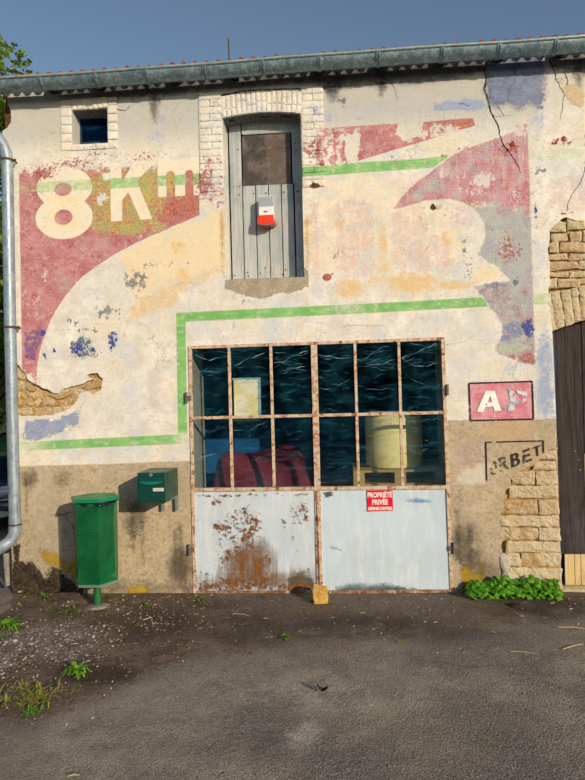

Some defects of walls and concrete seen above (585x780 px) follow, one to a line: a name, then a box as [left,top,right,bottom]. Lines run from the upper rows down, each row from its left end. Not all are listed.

water stain [59,60,484,115]
crack [462,60,521,173]
crack [549,58,568,119]
spalling [548,213,585,331]
spalling [17,365,103,440]
water stain [12,544,83,594]
rust [197,493,314,591]
spalling [498,433,563,592]